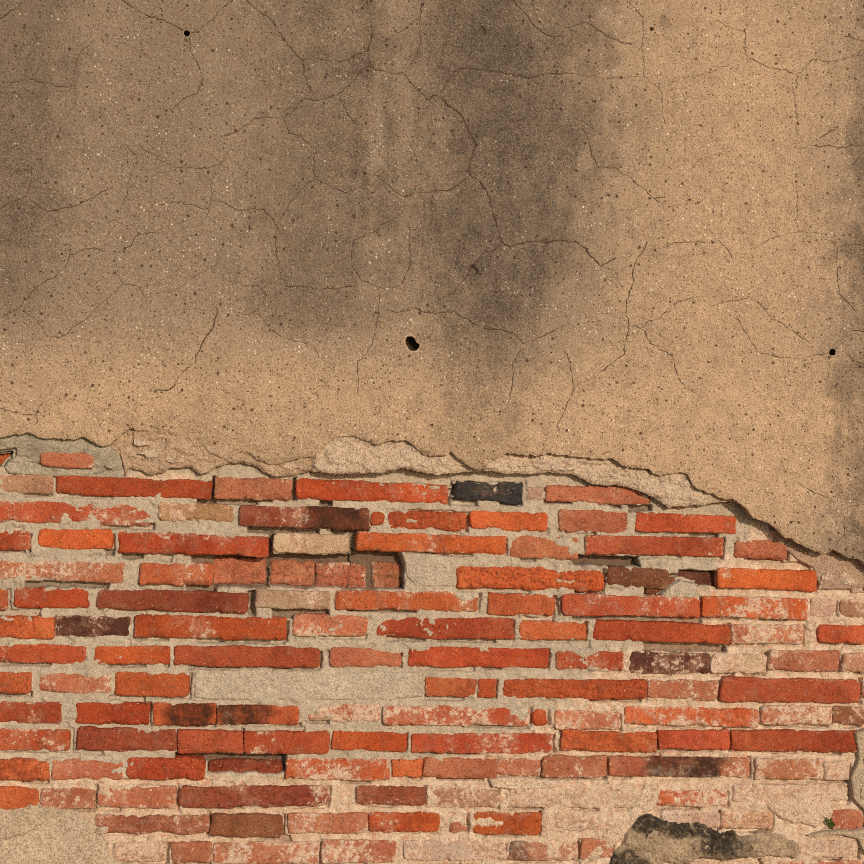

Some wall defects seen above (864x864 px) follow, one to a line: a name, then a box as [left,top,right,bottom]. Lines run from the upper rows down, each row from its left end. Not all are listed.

crack [717,20,862,149]
crack [0,0,733,433]
crack [713,298,864,365]
spalling [0,428,738,508]
spalling [768,529,864,590]
peeling [611,725,864,864]
peeling [0,801,141,864]
water stain [610,850,647,864]
water stain [633,814,743,857]